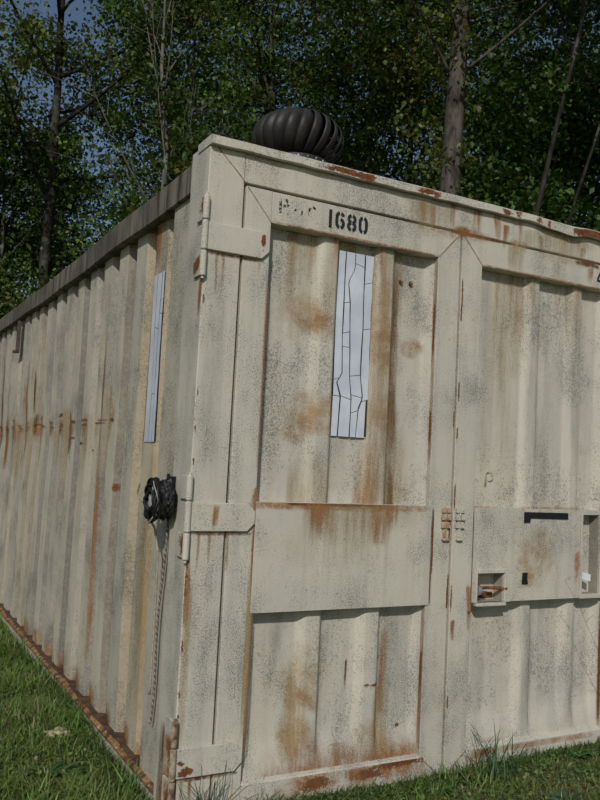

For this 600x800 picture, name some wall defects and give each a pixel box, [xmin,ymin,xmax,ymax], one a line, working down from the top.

corrosion [193,254,204,307]
corrosion [451,208,523,242]
corrosion [561,228,600,275]
corrosion [288,225,434,441]
corrosion [0,353,114,464]
corrosion [91,467,99,560]
corrosion [253,461,397,541]
corrosion [242,525,255,747]
corrosion [446,576,454,635]
corrosion [334,640,423,784]
corrosion [156,730,206,800]
corrosion [294,761,333,793]